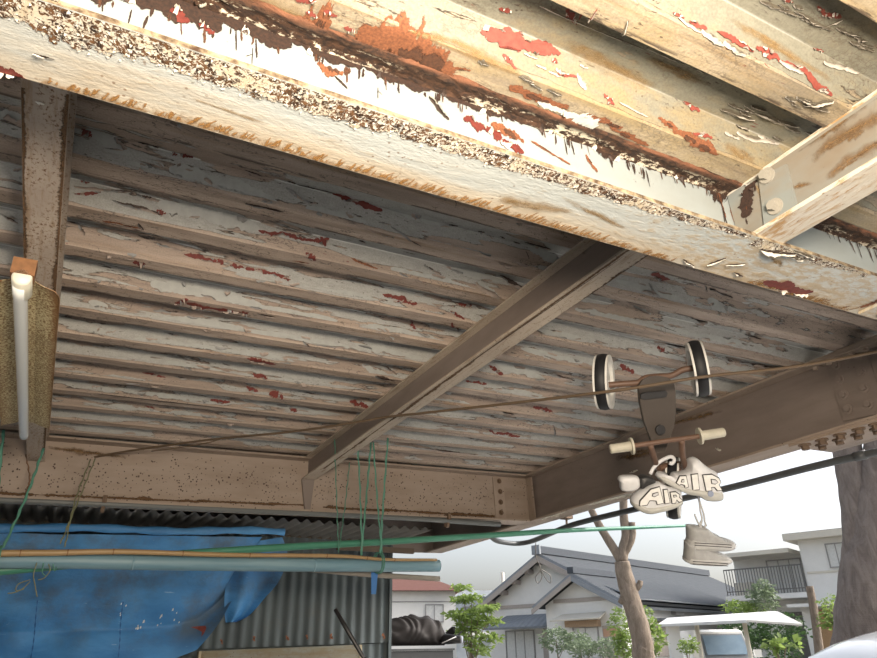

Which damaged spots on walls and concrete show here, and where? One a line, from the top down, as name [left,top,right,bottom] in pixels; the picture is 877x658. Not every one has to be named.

rust [91,0,759,224]
peeling [0,0,875,281]
rust [813,216,877,261]
peeling [88,300,108,308]
peeling [391,265,522,299]
peeling [763,280,813,298]
peeling [92,333,344,426]
peeling [94,279,444,382]
peeling [466,380,553,420]
peeling [489,362,575,381]
peeling [521,347,583,364]
peeling [575,305,762,365]